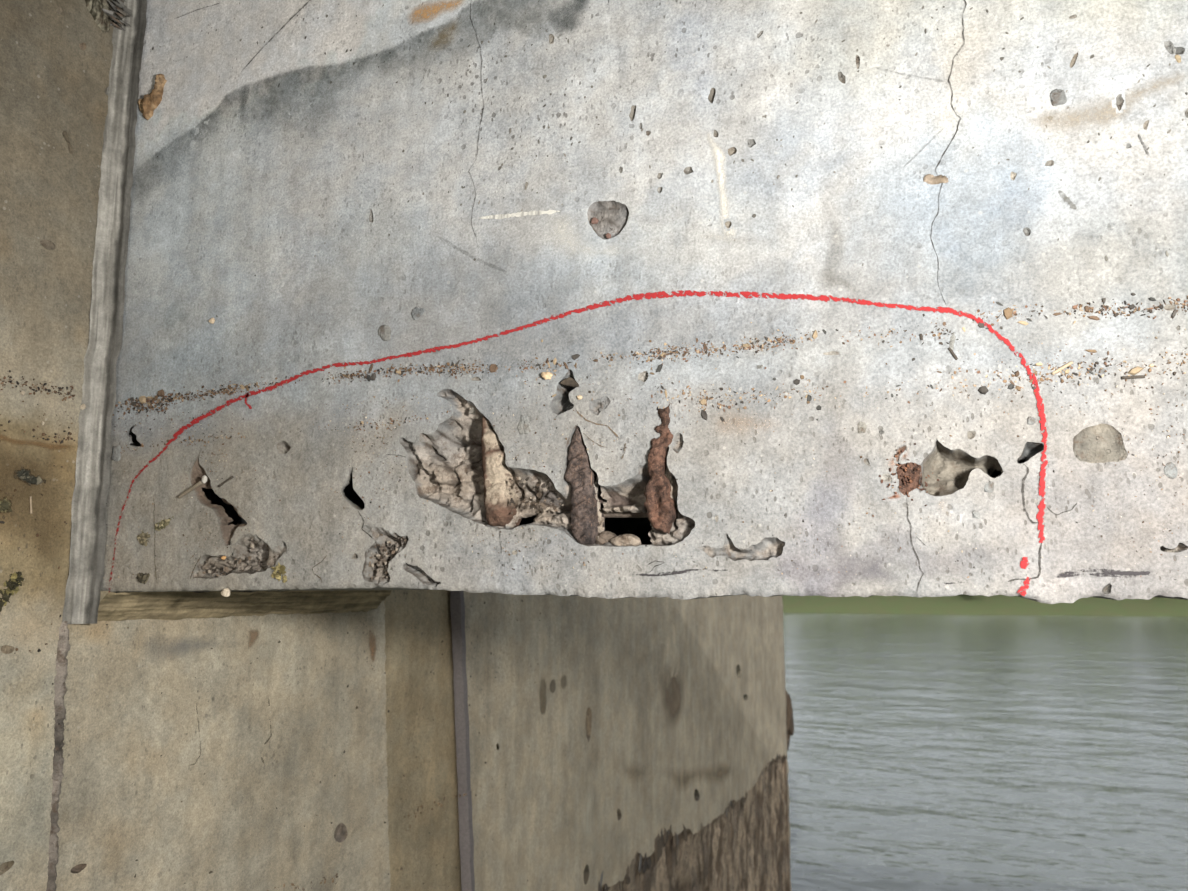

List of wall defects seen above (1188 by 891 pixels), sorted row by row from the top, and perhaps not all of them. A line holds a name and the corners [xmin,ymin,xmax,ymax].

rust [412,2,459,19]
damp [559,0,586,27]
damp [265,50,394,112]
crack [930,0,967,304]
spalling [399,369,695,547]
rust [879,443,939,506]
spalling [920,431,1003,496]
spalling [1017,442,1044,462]
spalling [190,449,287,579]
spalling [351,524,441,587]
spalling [698,533,785,561]